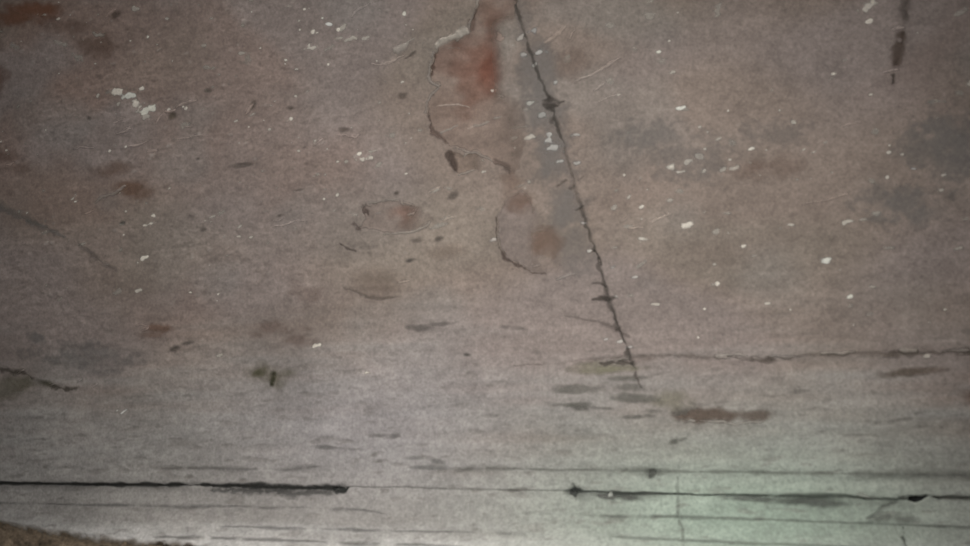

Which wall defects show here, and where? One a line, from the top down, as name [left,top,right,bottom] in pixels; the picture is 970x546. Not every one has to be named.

crack [512,4,581,165]
peeling [445,148,493,176]
peeling [353,192,430,235]
crack [581,208,639,384]
crack [0,481,349,495]
crack [570,469,907,506]
crack [935,493,970,501]